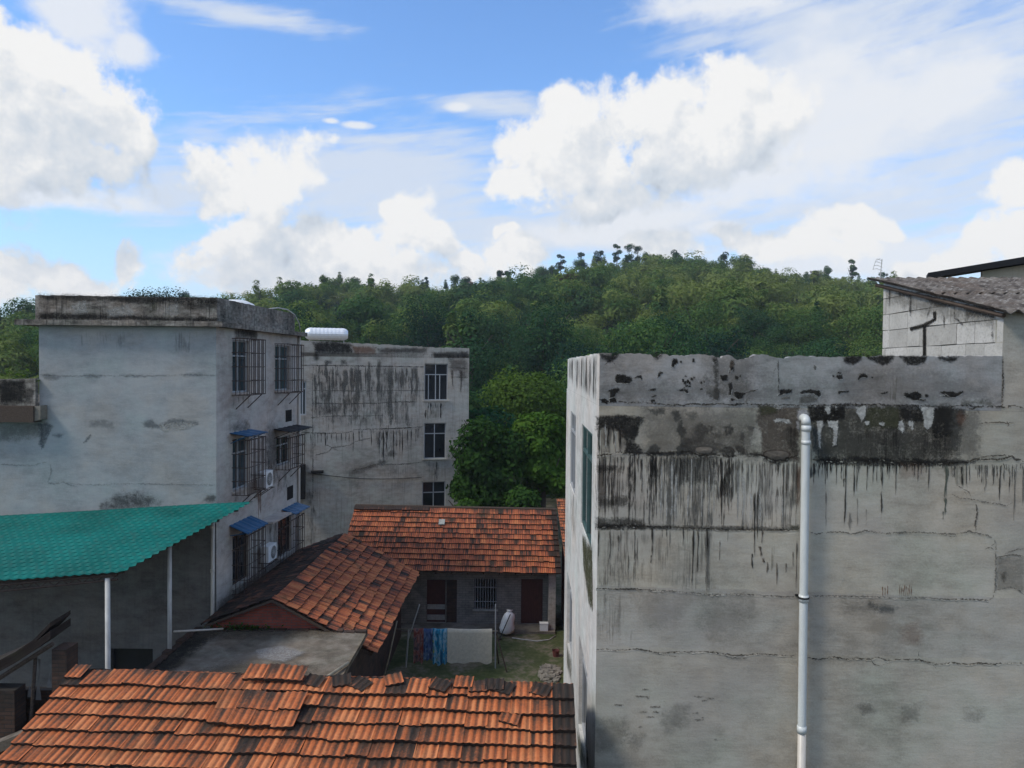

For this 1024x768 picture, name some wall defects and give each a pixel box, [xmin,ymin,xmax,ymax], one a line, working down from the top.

leakage [310,342,468,458]
spalling [600,358,695,404]
spalling [720,360,758,401]
flaking render [855,391,963,433]
leakage [571,404,1024,609]
crack [596,450,1024,603]
crack [596,648,1024,668]